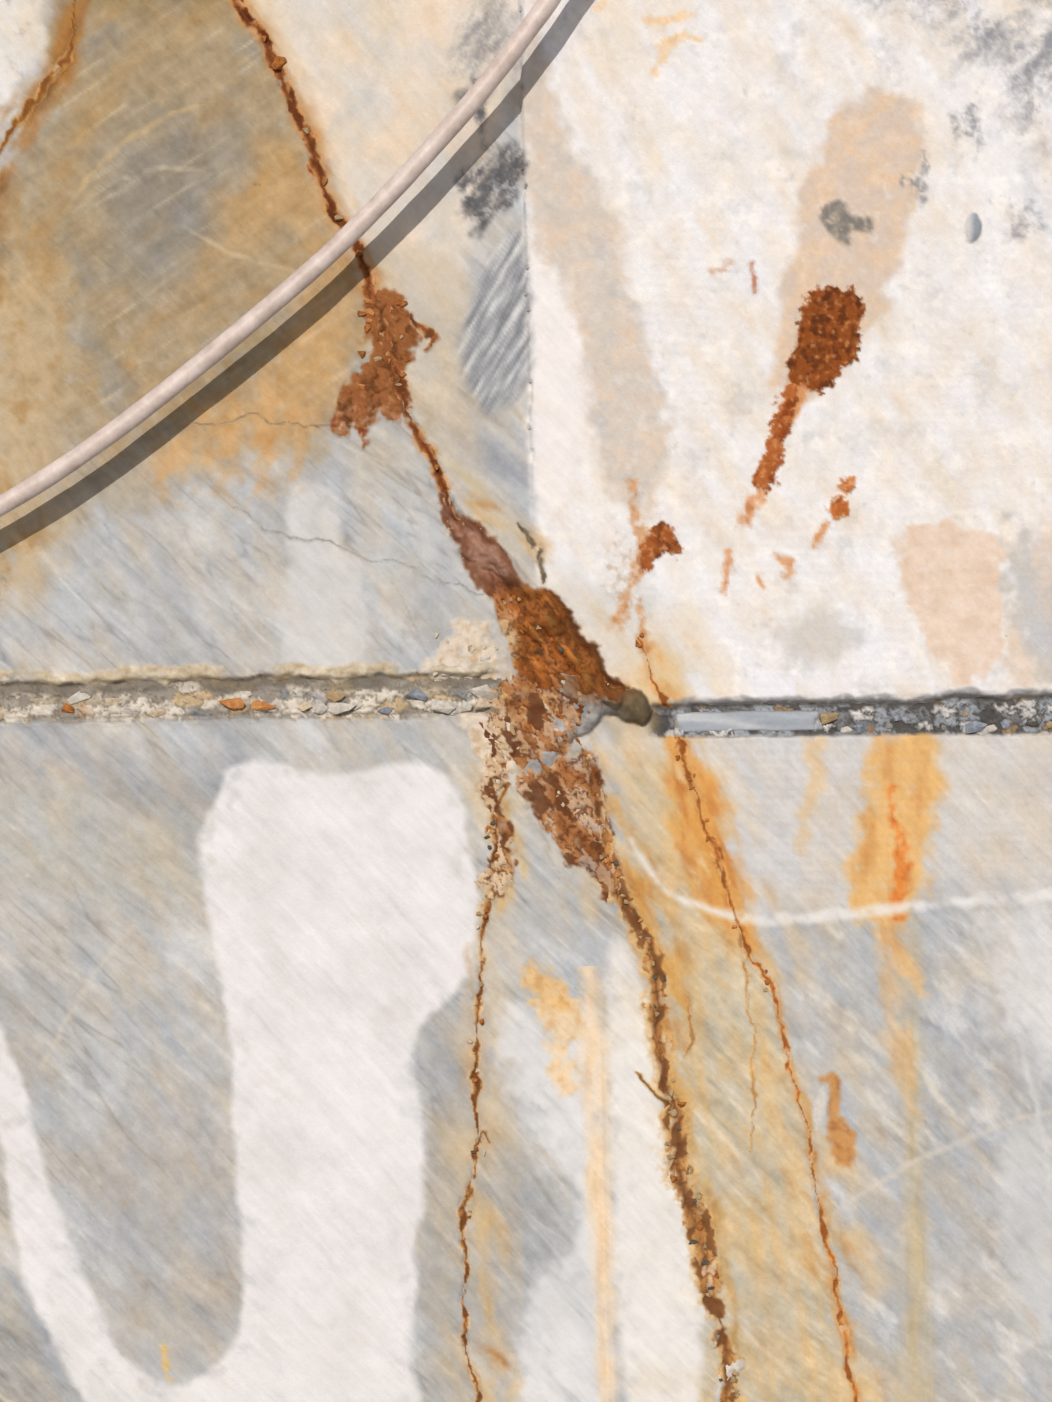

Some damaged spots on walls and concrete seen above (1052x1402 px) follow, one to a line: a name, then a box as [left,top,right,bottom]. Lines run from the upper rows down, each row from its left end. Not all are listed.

crack [0,0,96,293]
leakage [0,0,333,495]
leakage [0,259,371,624]
crack [181,412,330,429]
crack [226,0,557,597]
rust [600,473,685,654]
rust [717,283,868,596]
crack [454,780,533,1402]
crack [574,633,1052,1402]